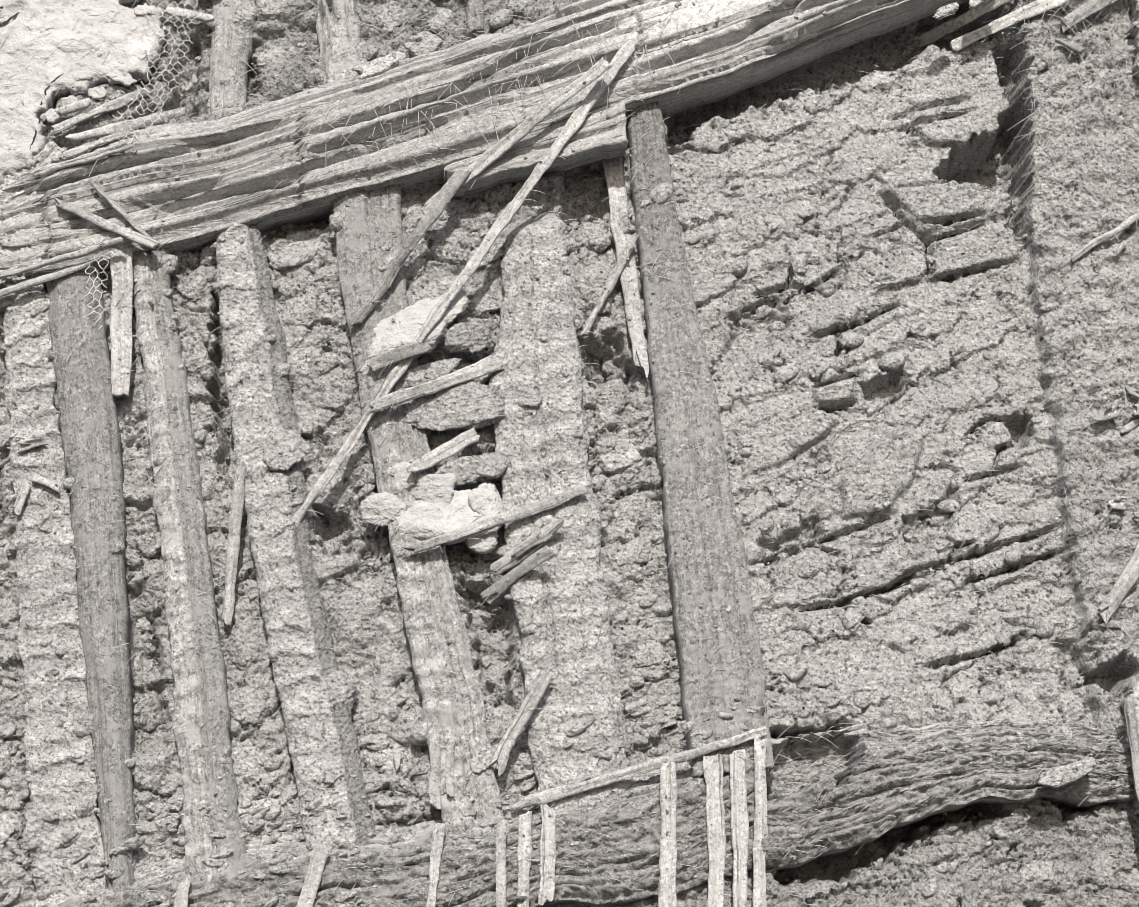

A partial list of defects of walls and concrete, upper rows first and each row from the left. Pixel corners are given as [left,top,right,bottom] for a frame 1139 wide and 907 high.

flaking render [0,6,19,27]
flaking render [134,3,157,16]
flaking render [934,0,993,19]
flaking render [45,70,137,124]
crack [878,213,984,283]
crack [756,262,841,298]
crack [807,309,893,413]
crack [964,420,1011,482]
crack [755,518,890,566]
crack [799,526,1068,624]